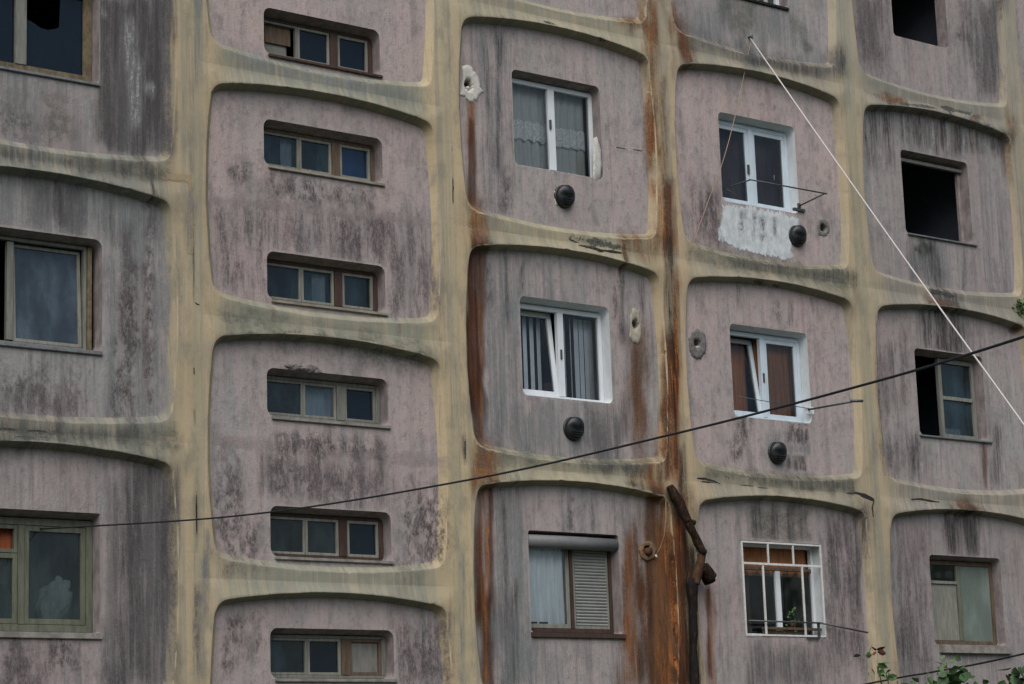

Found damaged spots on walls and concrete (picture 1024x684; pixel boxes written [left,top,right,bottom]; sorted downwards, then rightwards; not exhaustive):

leakage [64,0,173,178]
leakage [957,0,1002,92]
spalling [569,236,624,250]
peeling [718,202,799,260]
rust [466,101,496,684]
rust [619,7,713,684]
leakage [102,472,178,684]